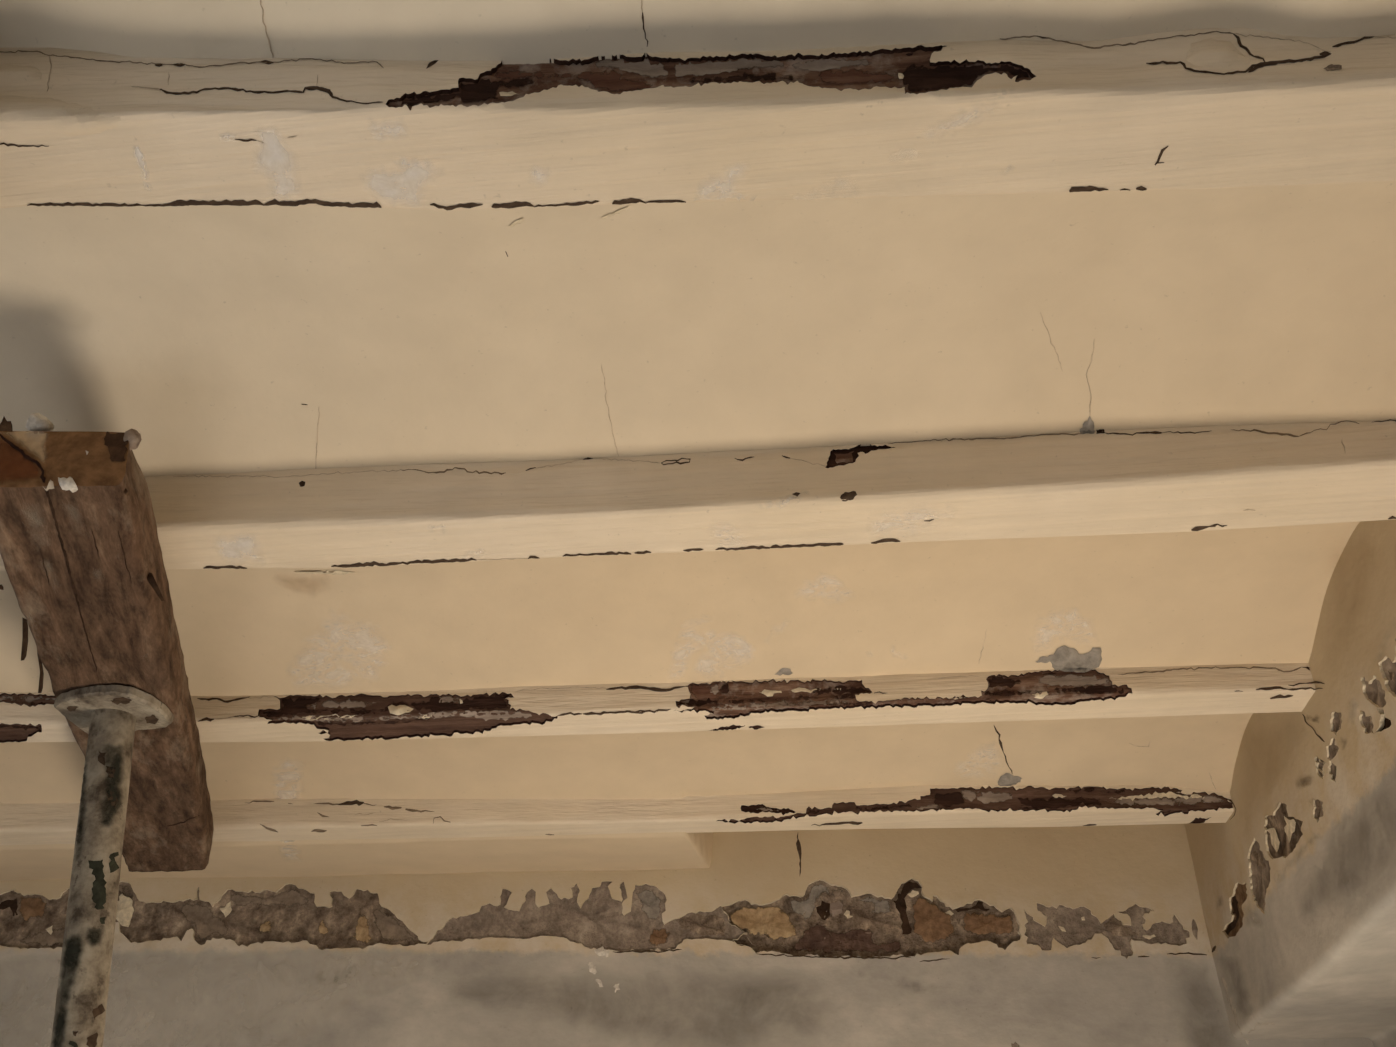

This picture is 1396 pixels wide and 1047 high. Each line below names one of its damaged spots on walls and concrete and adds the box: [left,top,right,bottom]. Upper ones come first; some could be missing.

crack [0,0,382,104]
peeling [386,45,1036,111]
crack [1000,31,1396,75]
peeling [825,444,895,468]
peeling [0,693,56,743]
peeling [258,692,558,741]
peeling [676,670,1132,731]
flaking render [1359,638,1396,734]
peeling [717,786,1233,826]
peeling [88,852,143,943]
spalling [664,878,1198,958]
flaking render [1222,799,1324,938]